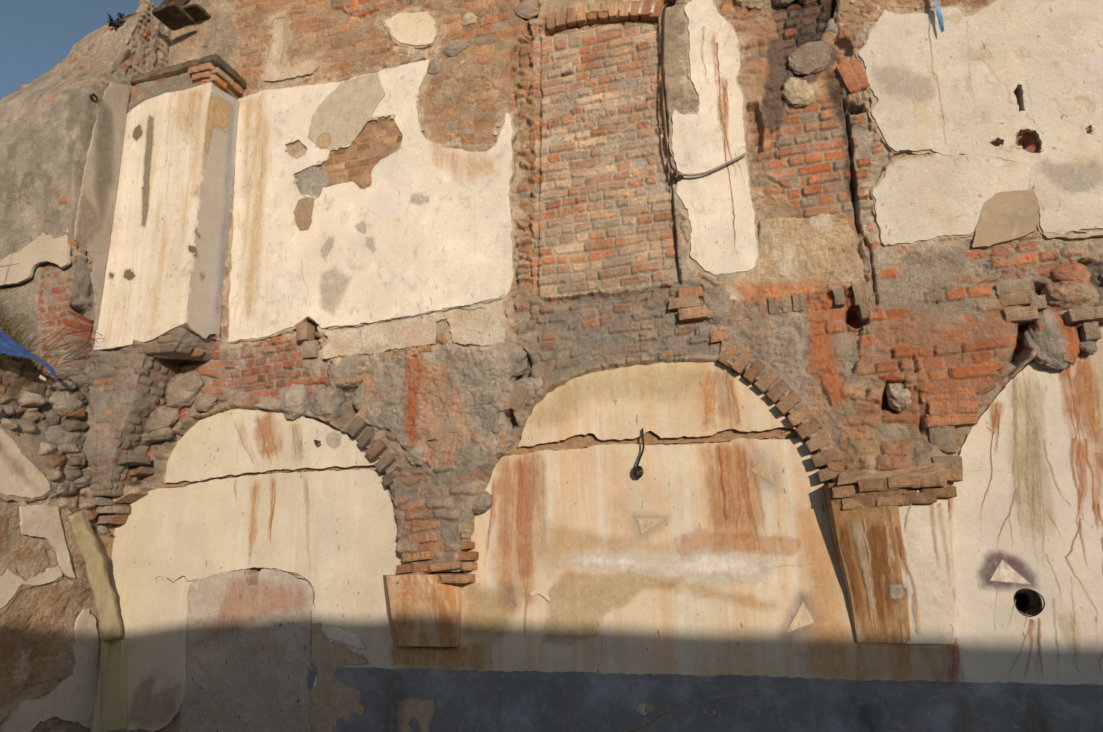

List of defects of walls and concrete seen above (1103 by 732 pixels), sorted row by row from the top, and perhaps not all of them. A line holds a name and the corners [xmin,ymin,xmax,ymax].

spalling [285,73,403,231]
corrosion [702,42,735,231]
spalling [1015,127,1044,153]
corrosion [257,414,277,458]
corrosion [712,445,757,539]
corrosion [982,411,1000,505]
corrosion [1061,366,1103,583]
corrosion [492,458,545,630]
spalling [0,587,77,732]
corrosion [1025,613,1042,670]
peeling [395,698,434,732]